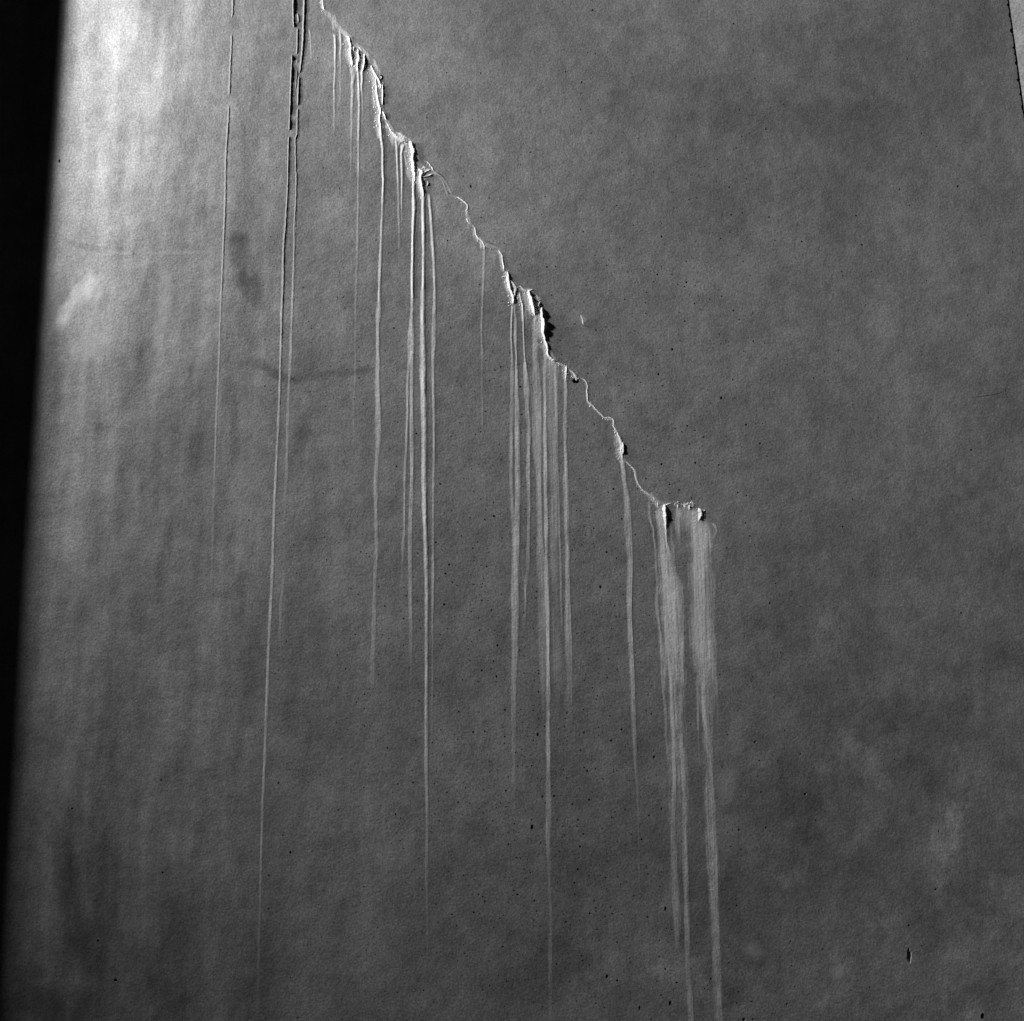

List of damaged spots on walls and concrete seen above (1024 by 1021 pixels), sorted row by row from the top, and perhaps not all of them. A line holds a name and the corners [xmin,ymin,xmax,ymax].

water stain [333,30,342,99]
water stain [350,68,363,169]
crack [320,0,706,536]
water stain [265,415,279,717]
water stain [375,127,436,805]
water stain [510,305,570,772]
water stain [649,509,716,784]
water stain [706,763,719,976]